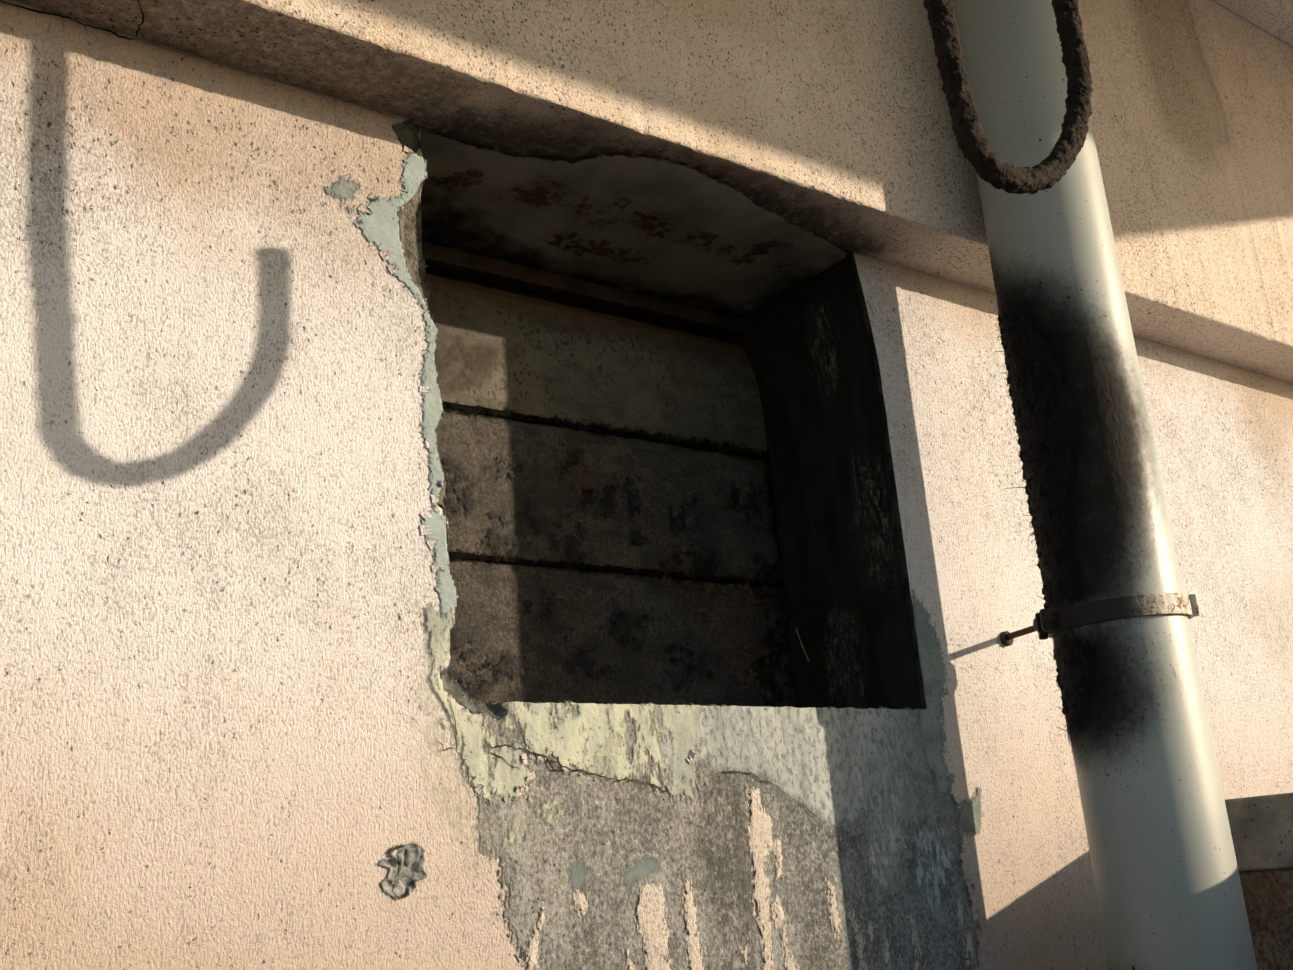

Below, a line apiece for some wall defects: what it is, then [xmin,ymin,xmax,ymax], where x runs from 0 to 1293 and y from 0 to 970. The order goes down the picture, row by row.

crack [0,0,399,119]
corrosion [499,177,795,272]
peeling [324,119,985,970]
crack [722,771,819,820]